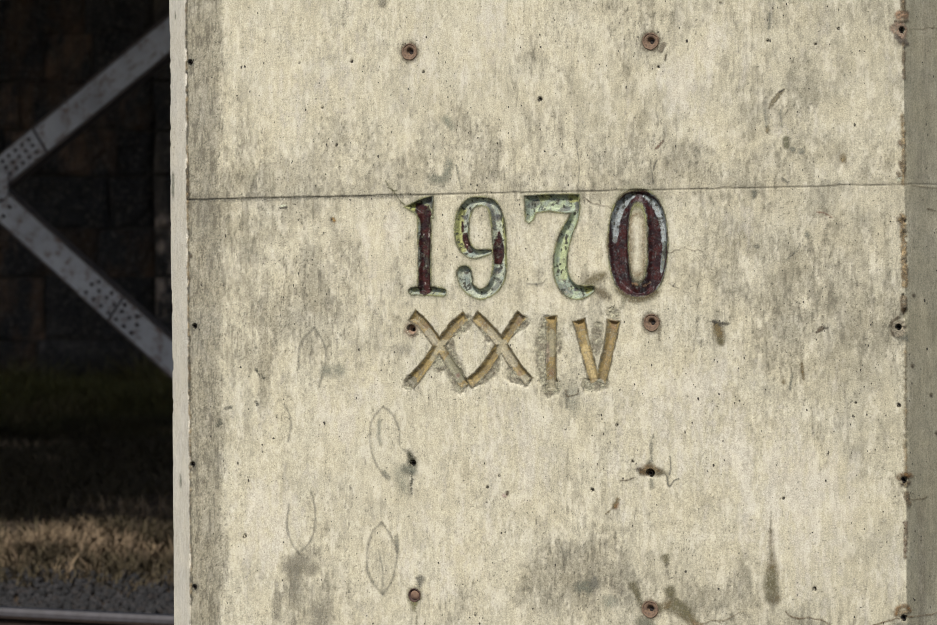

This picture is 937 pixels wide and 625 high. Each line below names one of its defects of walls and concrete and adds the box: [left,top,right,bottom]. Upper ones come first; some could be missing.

rust [630,583,699,625]
water stain [765,530,779,606]